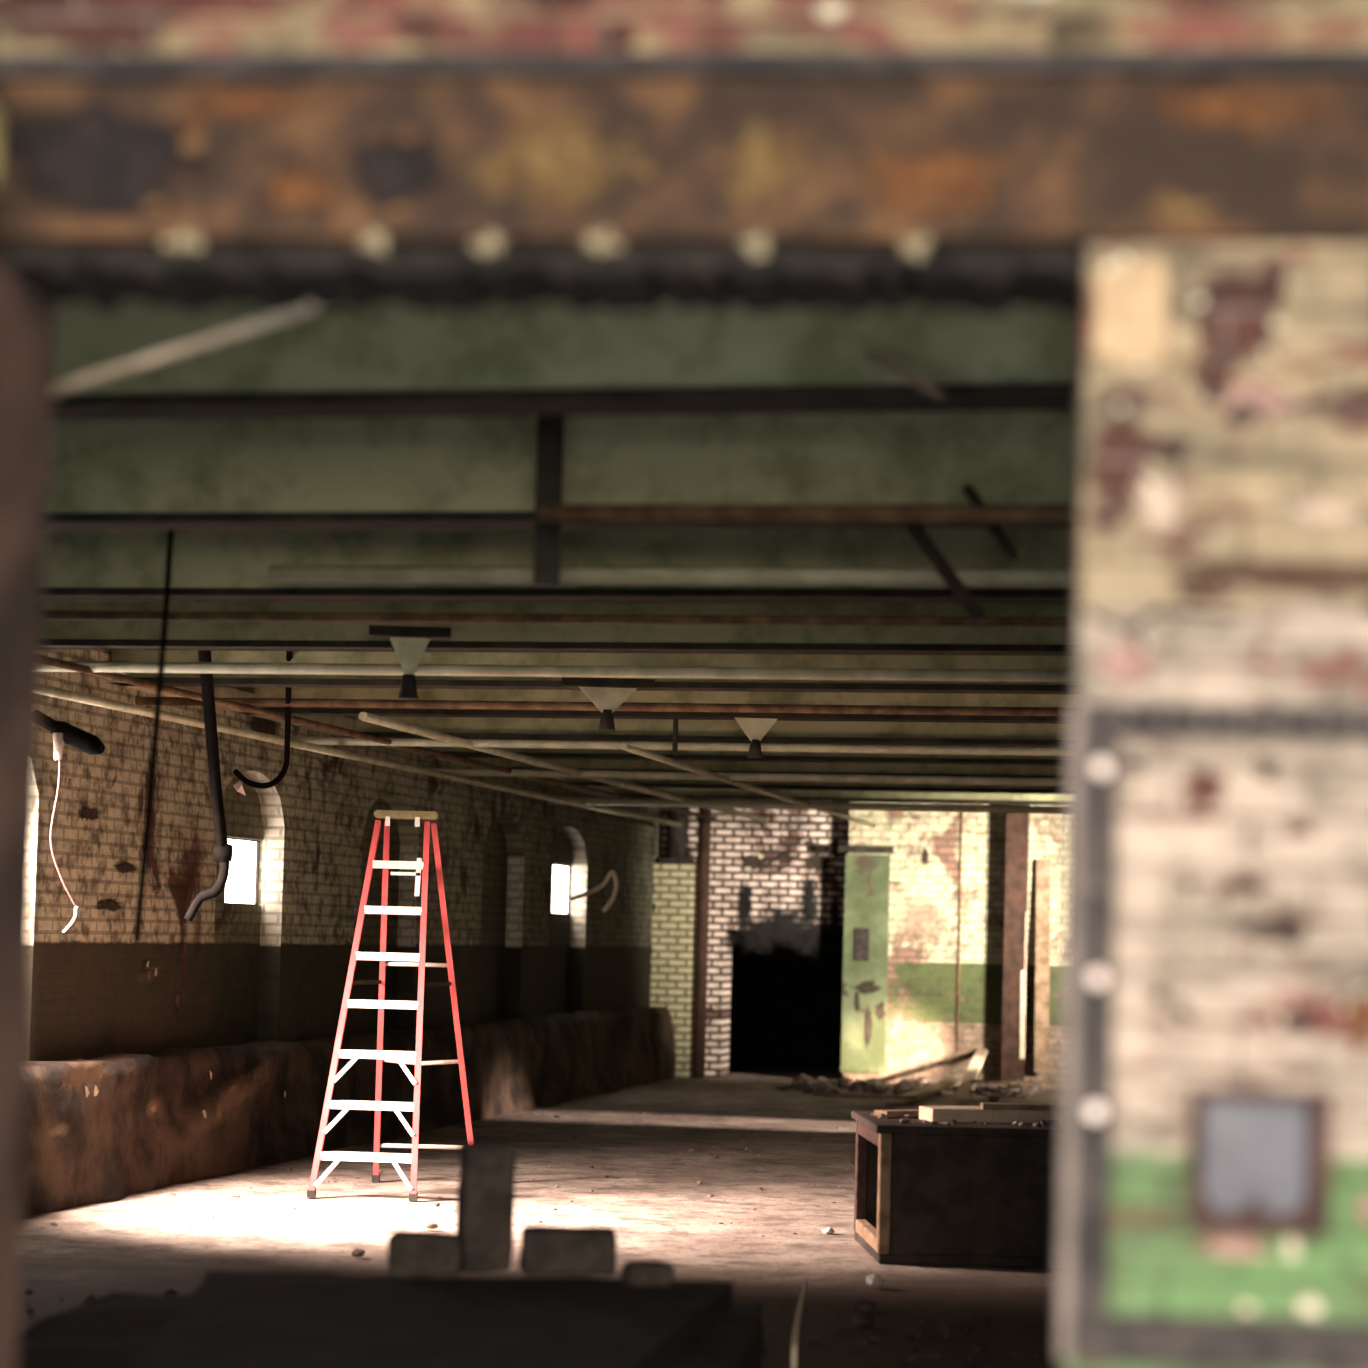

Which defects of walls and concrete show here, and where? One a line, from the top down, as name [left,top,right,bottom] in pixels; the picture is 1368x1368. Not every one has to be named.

spalling [1190,257,1286,425]
peeling [1090,254,1192,532]
peeling [1294,389,1368,431]
spalling [1175,560,1368,613]
peeling [886,1016,956,1076]